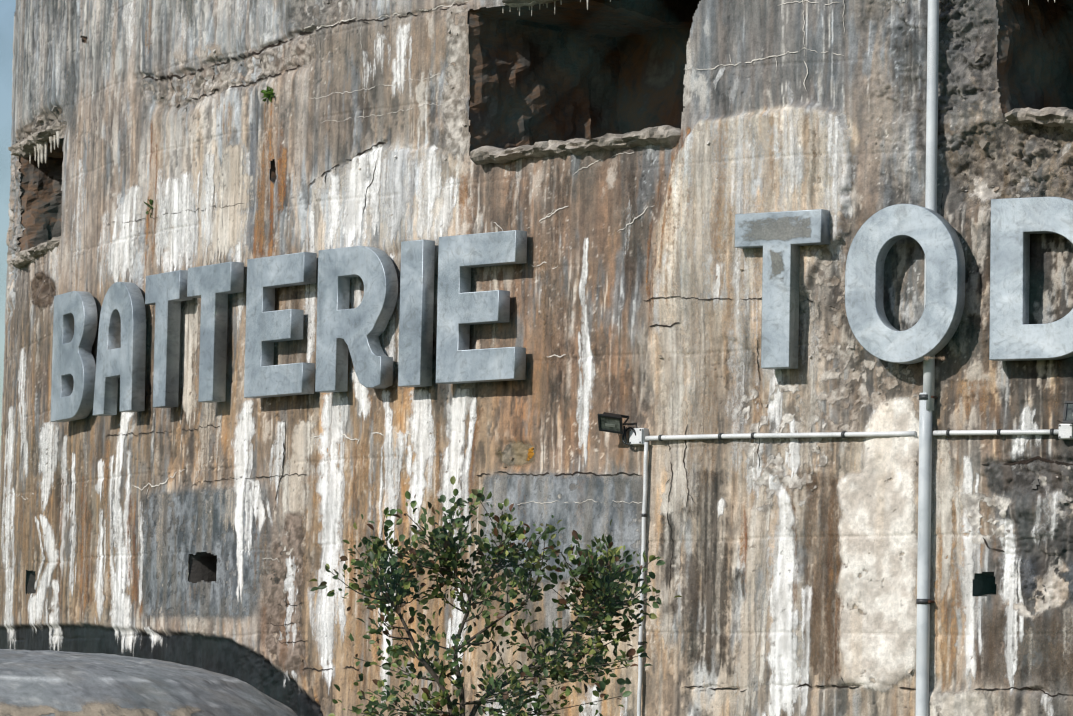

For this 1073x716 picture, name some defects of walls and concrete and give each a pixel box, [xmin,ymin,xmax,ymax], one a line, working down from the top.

crack [308,142,385,212]
spalling [441,7,470,160]
crack [686,0,845,91]
spalling [938,0,1073,207]
damp [1,349,162,651]
damp [220,370,370,692]
rust [338,444,379,695]
damp [378,293,477,701]
damp [659,83,853,716]
spalling [960,453,1073,544]
crack [975,687,1070,697]
peeling [1005,559,1073,619]